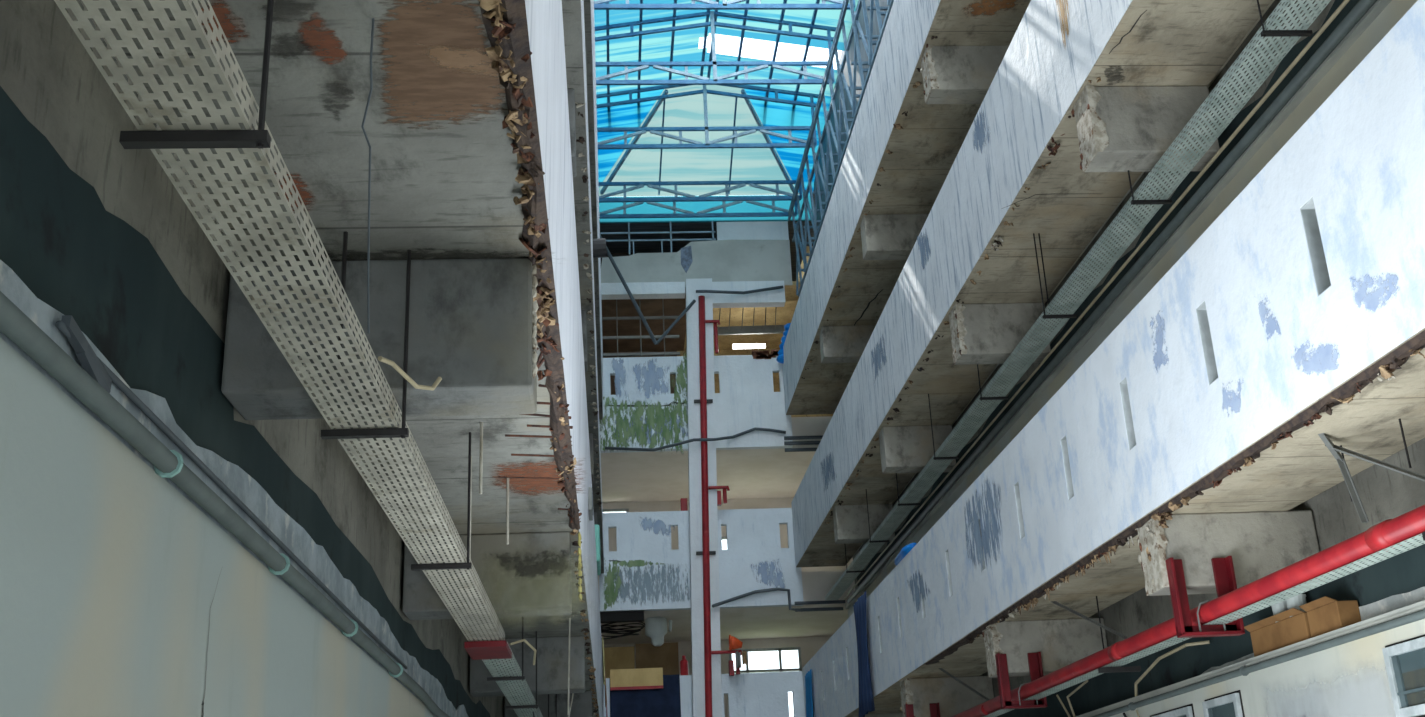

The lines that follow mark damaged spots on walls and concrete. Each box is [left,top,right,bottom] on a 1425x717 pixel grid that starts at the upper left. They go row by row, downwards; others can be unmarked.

rust [201,0,249,44]
rust [299,13,348,65]
rust [376,0,507,130]
rust [274,171,315,214]
peeling [917,228,931,269]
peeling [1350,274,1398,311]
peeling [1258,298,1280,339]
spalling [478,0,602,717]
peeling [1150,313,1169,370]
rust [493,461,583,495]
spalling [925,330,1425,677]
leakage [606,565,689,604]